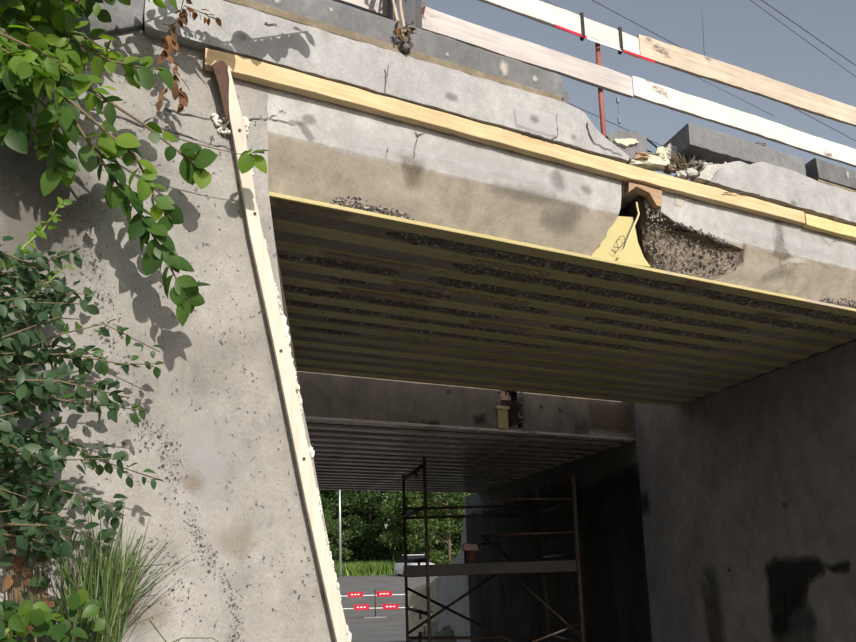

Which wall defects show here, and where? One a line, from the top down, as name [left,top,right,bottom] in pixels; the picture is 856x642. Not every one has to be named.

crack [93,108,234,150]
crack [523,115,621,155]
spalling [618,195,743,280]
water stain [766,558,849,642]